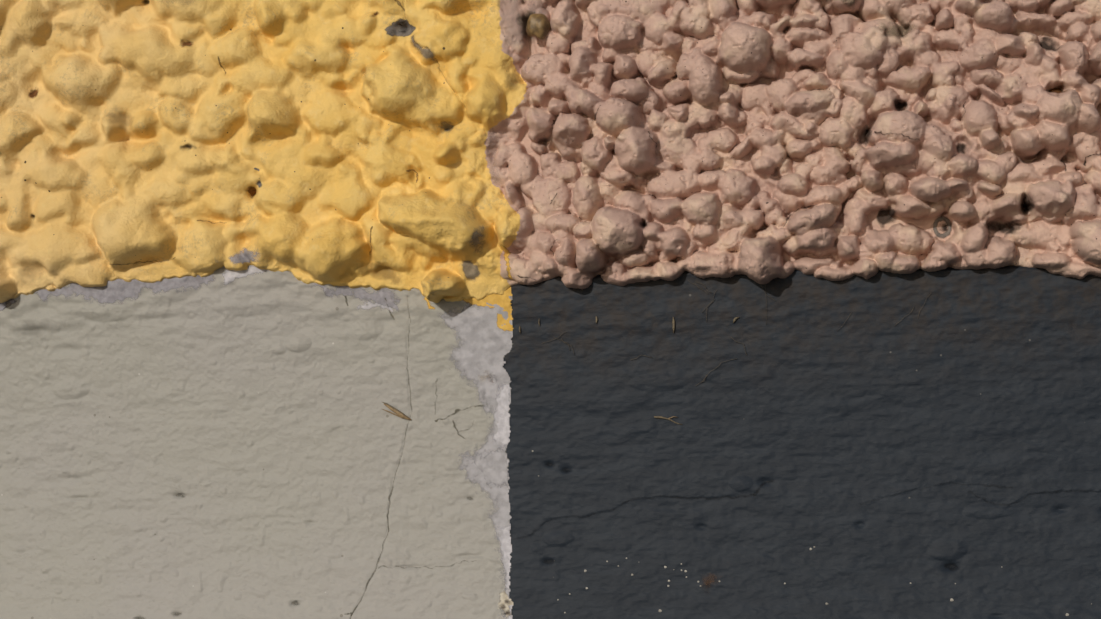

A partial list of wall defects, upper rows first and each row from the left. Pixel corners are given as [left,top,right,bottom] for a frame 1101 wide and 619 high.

peeling [37,249,268,304]
peeling [314,283,400,312]
peeling [441,296,521,619]